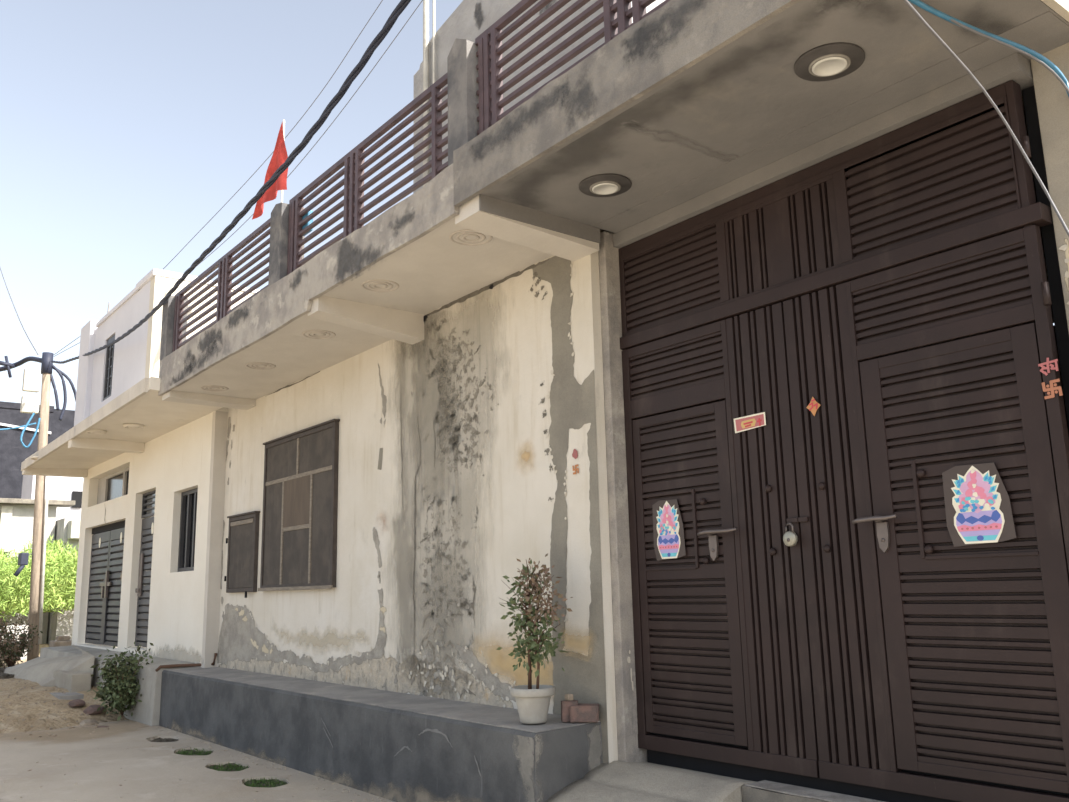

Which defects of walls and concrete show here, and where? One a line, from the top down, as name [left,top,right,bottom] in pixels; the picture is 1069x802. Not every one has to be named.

water stain [472,83,591,158]
water stain [625,0,702,56]
water stain [173,309,248,384]
water stain [219,302,513,708]
spalling [217,318,516,707]
peeling [530,256,609,764]